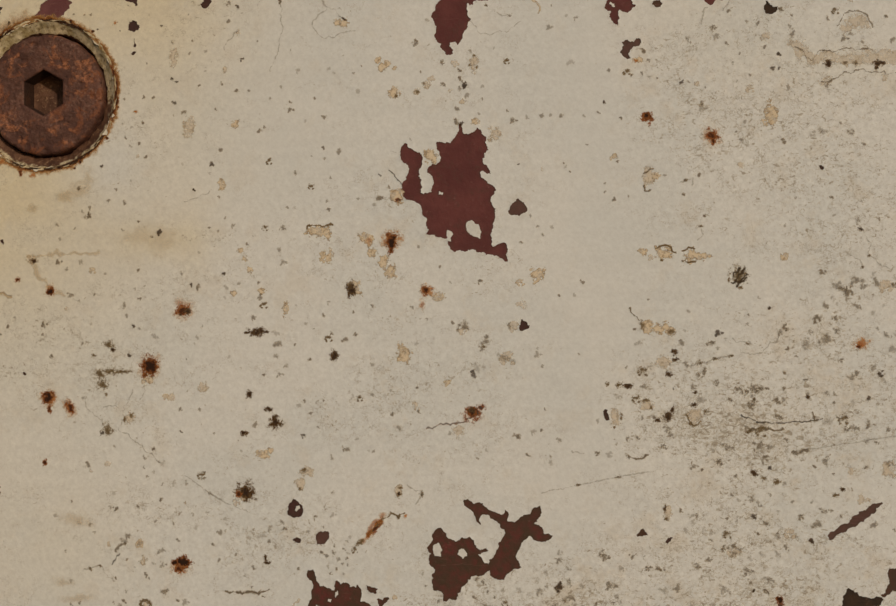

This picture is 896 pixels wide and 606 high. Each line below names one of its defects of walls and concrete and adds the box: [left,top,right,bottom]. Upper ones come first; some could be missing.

peeling [431,0,488,55]
corrosion [0,15,120,177]
peeling [400,123,508,262]
corrosion [381,231,404,255]
corrosion [139,353,160,378]
corrosion [40,390,74,414]
corrosion [426,404,486,435]
peeling [828,502,883,540]
corrosion [171,554,193,574]
peeling [427,499,552,602]
peeling [307,570,389,606]
peeling [842,568,896,606]